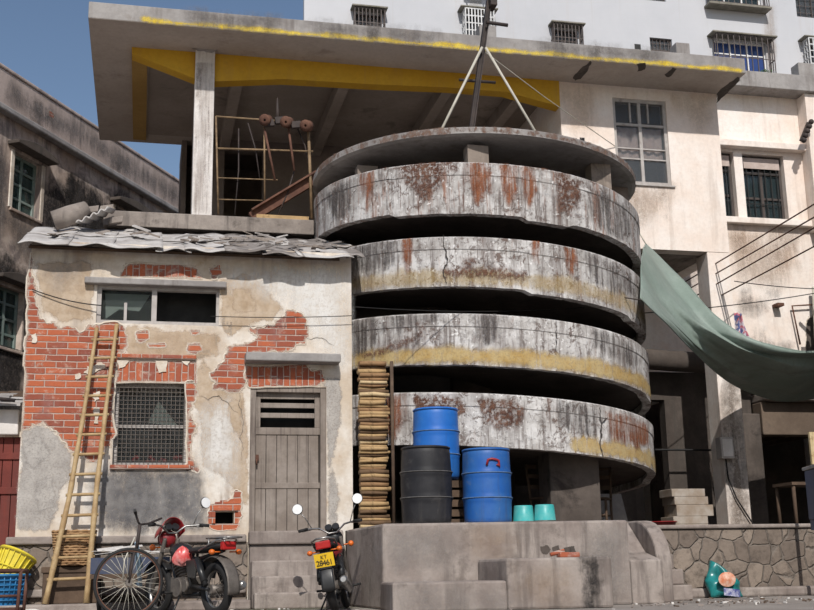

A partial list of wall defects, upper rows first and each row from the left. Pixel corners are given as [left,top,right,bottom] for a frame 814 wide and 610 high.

corrosion [470,162,537,205]
corrosion [554,174,580,215]
corrosion [402,239,412,266]
flaking render [21,252,326,532]
corrosion [387,397,402,438]
corrosion [609,413,648,446]
water stain [98,470,205,530]